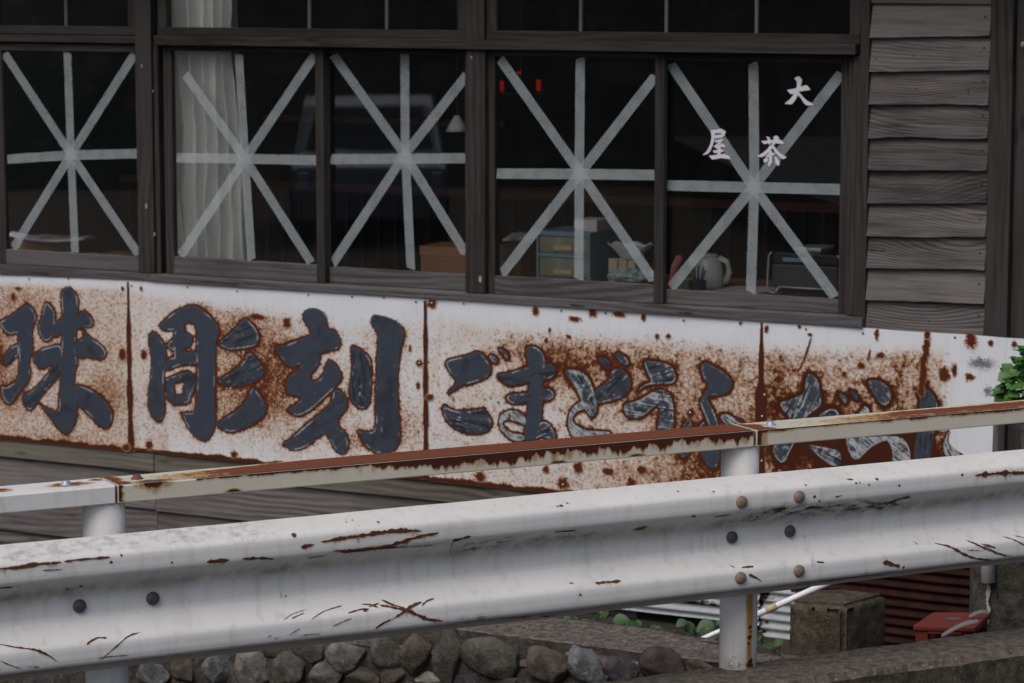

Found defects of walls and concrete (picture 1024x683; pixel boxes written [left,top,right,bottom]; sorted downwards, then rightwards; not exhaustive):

rust [0,282,1024,502]